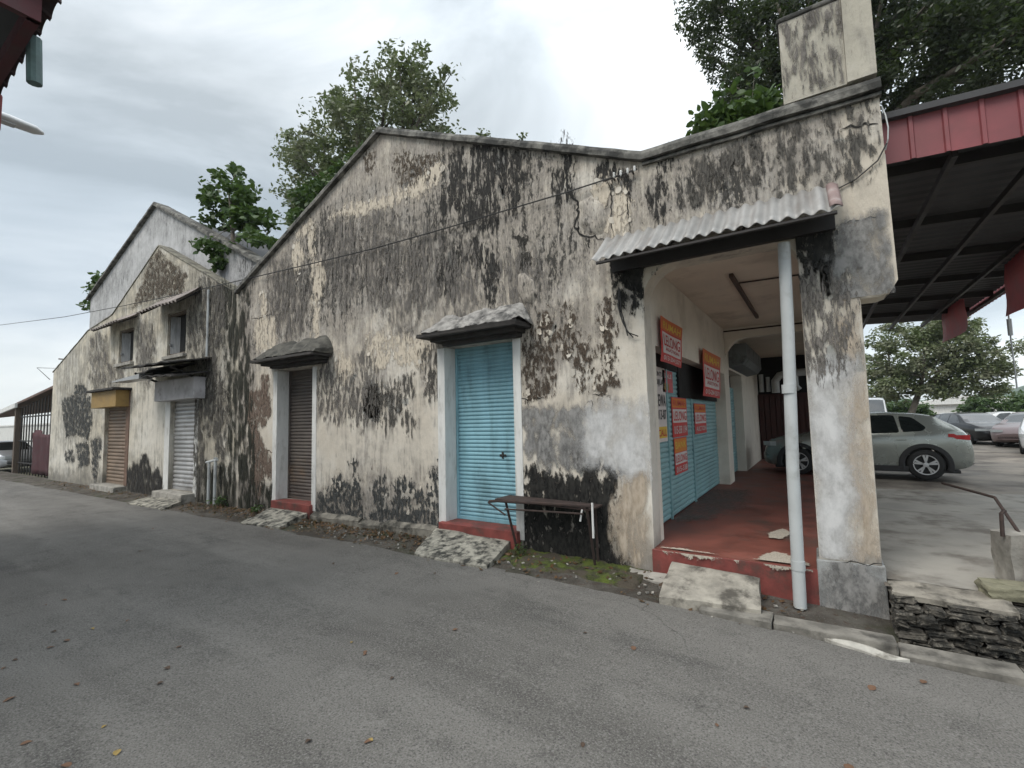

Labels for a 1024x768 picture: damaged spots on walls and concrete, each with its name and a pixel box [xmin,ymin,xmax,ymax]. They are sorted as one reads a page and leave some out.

damp [267,144,551,343]
crack [564,154,630,248]
peeling [590,175,636,238]
damp [591,98,880,228]
crack [842,121,878,129]
damp [799,258,860,388]
damp [132,249,233,506]
damp [316,343,445,438]
damp [126,451,162,495]
damp [521,405,650,568]
peeling [663,547,739,563]
peeling [758,551,791,571]